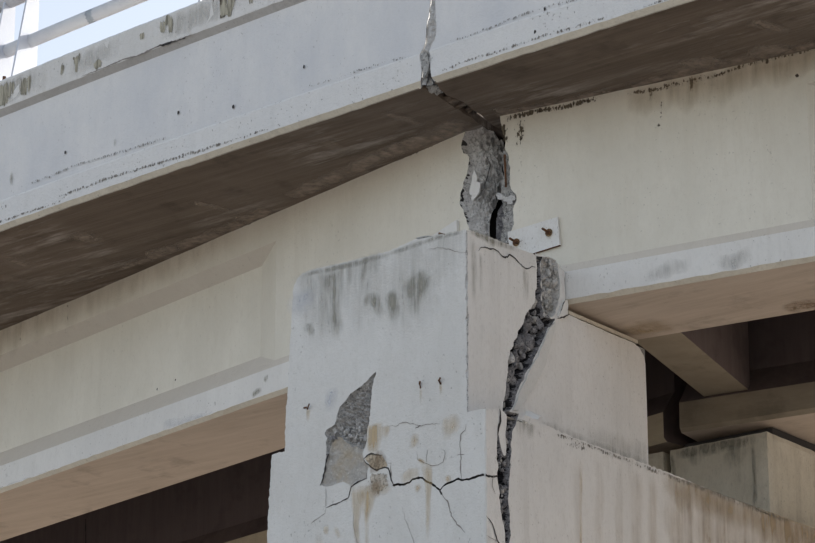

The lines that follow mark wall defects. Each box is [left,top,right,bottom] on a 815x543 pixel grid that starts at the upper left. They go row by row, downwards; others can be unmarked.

crack [421,0,437,86]
water stain [495,89,611,145]
water stain [628,42,815,99]
spalling [460,127,516,243]
spalling [320,372,388,494]
crack [313,247,570,543]